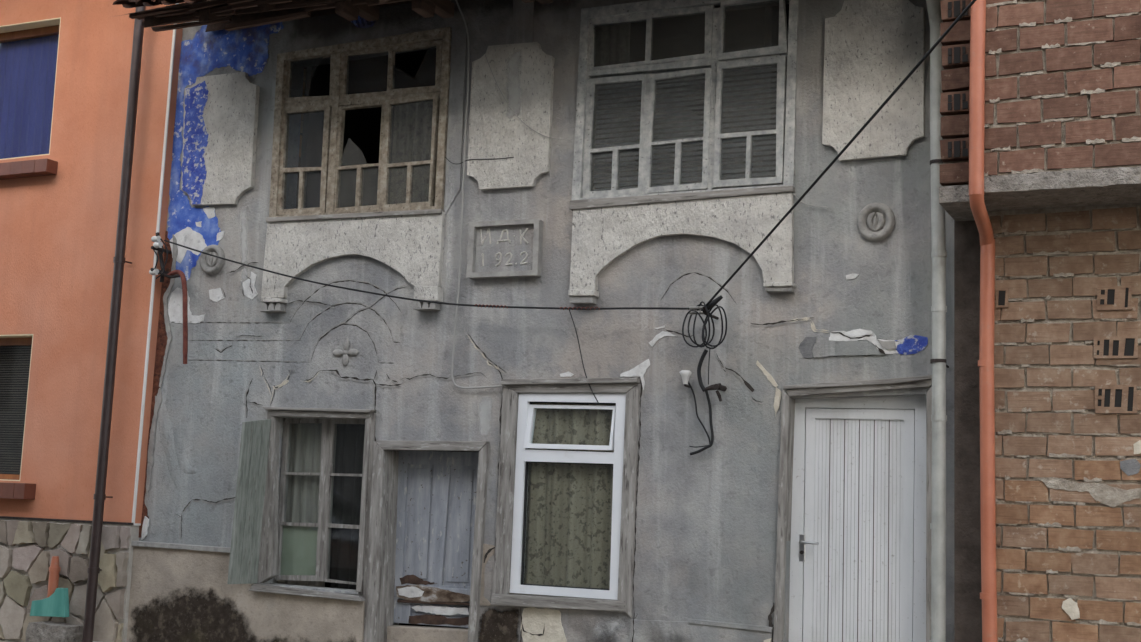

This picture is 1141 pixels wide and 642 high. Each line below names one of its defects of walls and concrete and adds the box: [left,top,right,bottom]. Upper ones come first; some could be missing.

peeling [139,22,284,540]
flaking render [799,329,928,359]
water stain [131,588,287,642]
water stain [478,605,522,642]